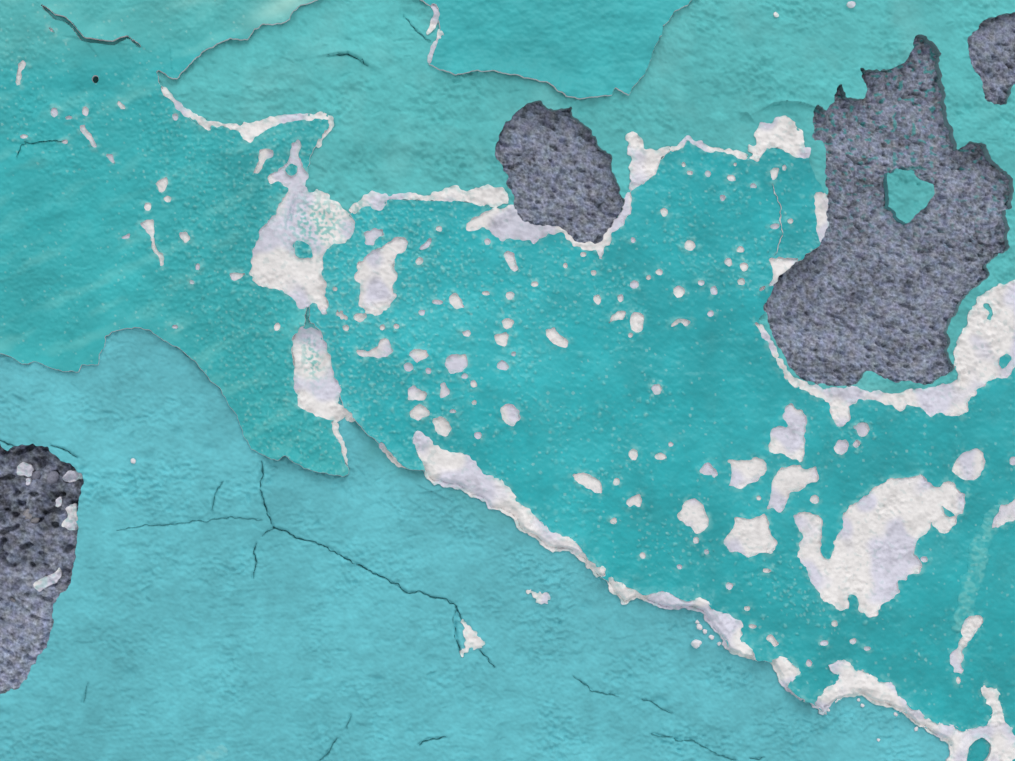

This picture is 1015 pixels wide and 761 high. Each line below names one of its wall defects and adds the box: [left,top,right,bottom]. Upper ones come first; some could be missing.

spalling [967,13,1015,105]
peeling [0,0,355,477]
peeling [309,37,1015,761]
spalling [0,444,84,693]
crack [121,462,494,666]